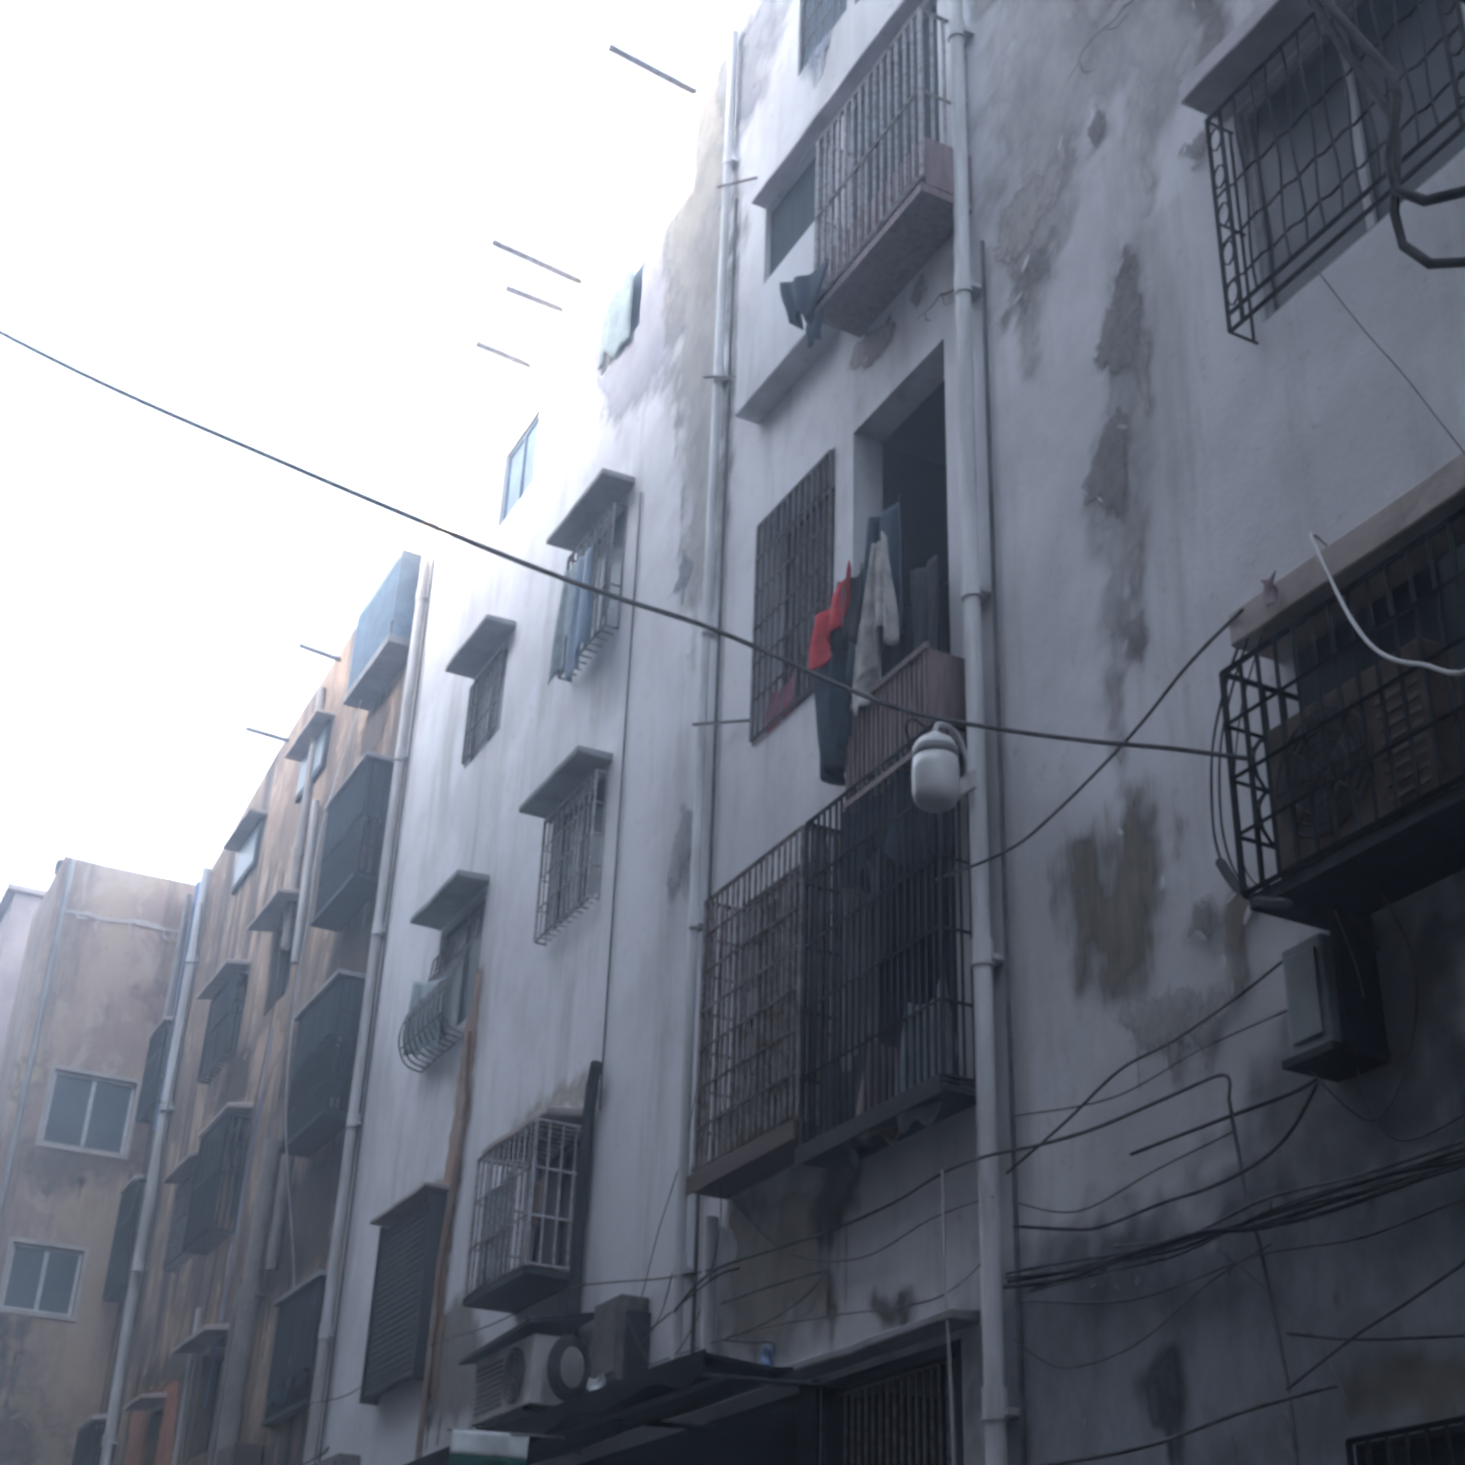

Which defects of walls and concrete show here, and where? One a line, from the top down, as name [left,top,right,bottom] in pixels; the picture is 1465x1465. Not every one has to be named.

water stain [452,0,776,604]
water stain [994,0,1218,370]
rust [428,967,482,1403]
water stain [729,1165,858,1356]
water stain [1139,1346,1183,1463]
water stain [1119,986,1237,1084]